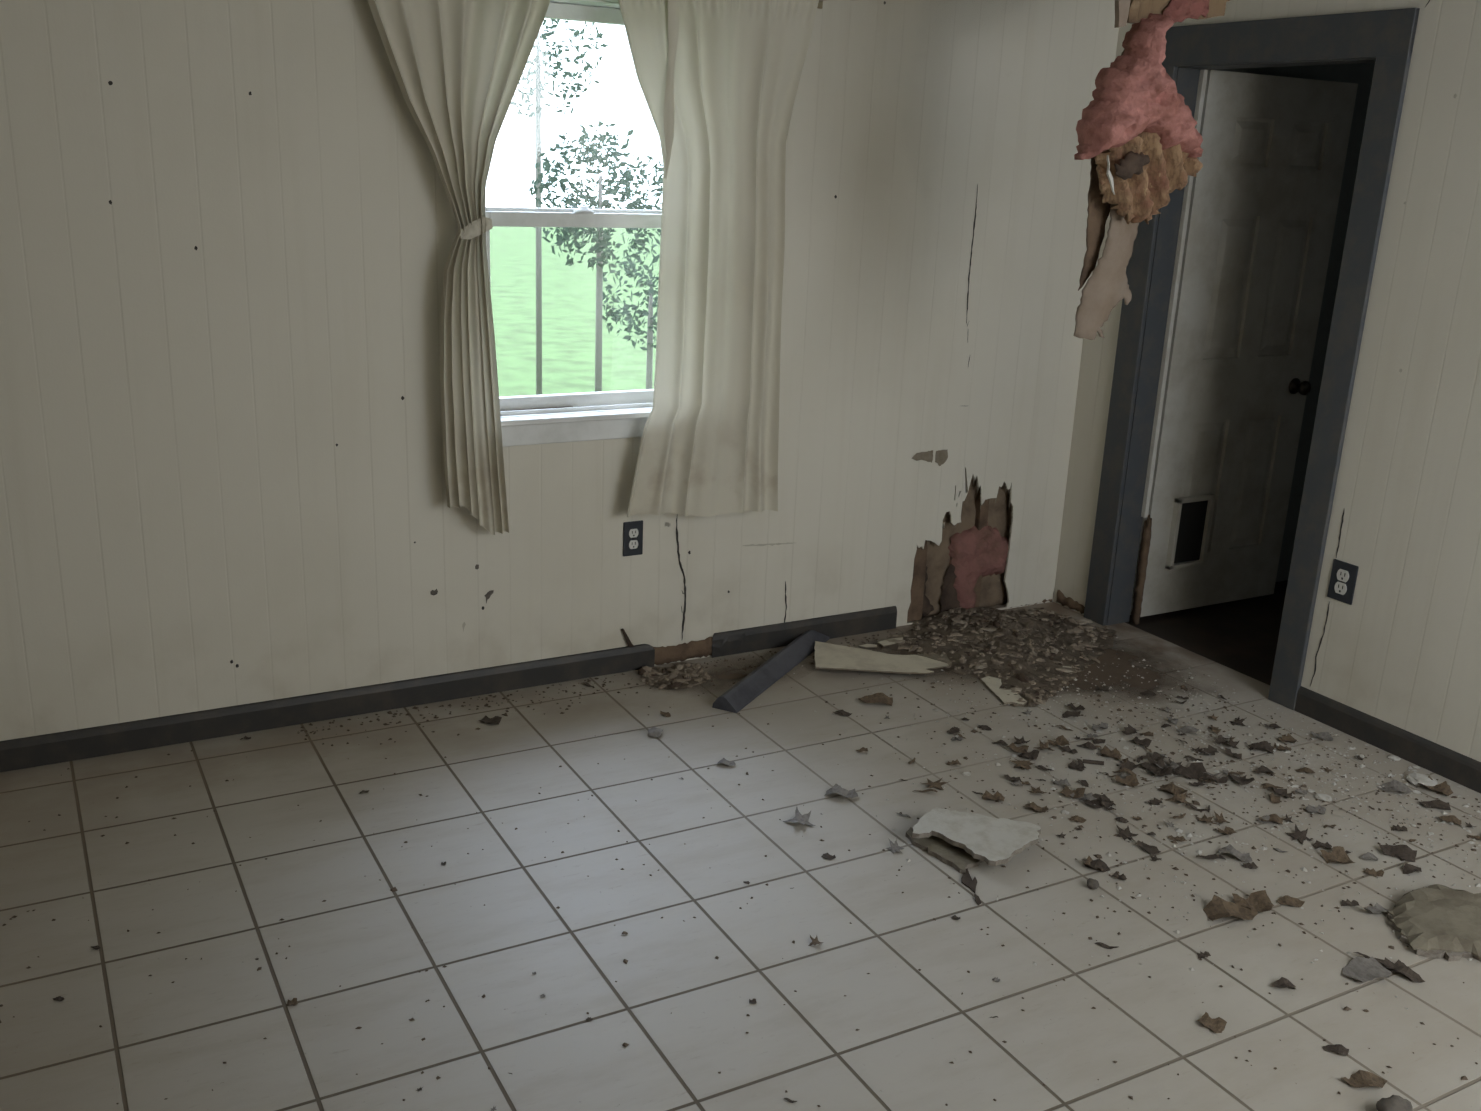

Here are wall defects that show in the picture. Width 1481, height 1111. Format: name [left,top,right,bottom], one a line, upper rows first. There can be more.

peeling [911,449,948,466]
crack [676,518,686,639]
spalling [907,476,1013,622]